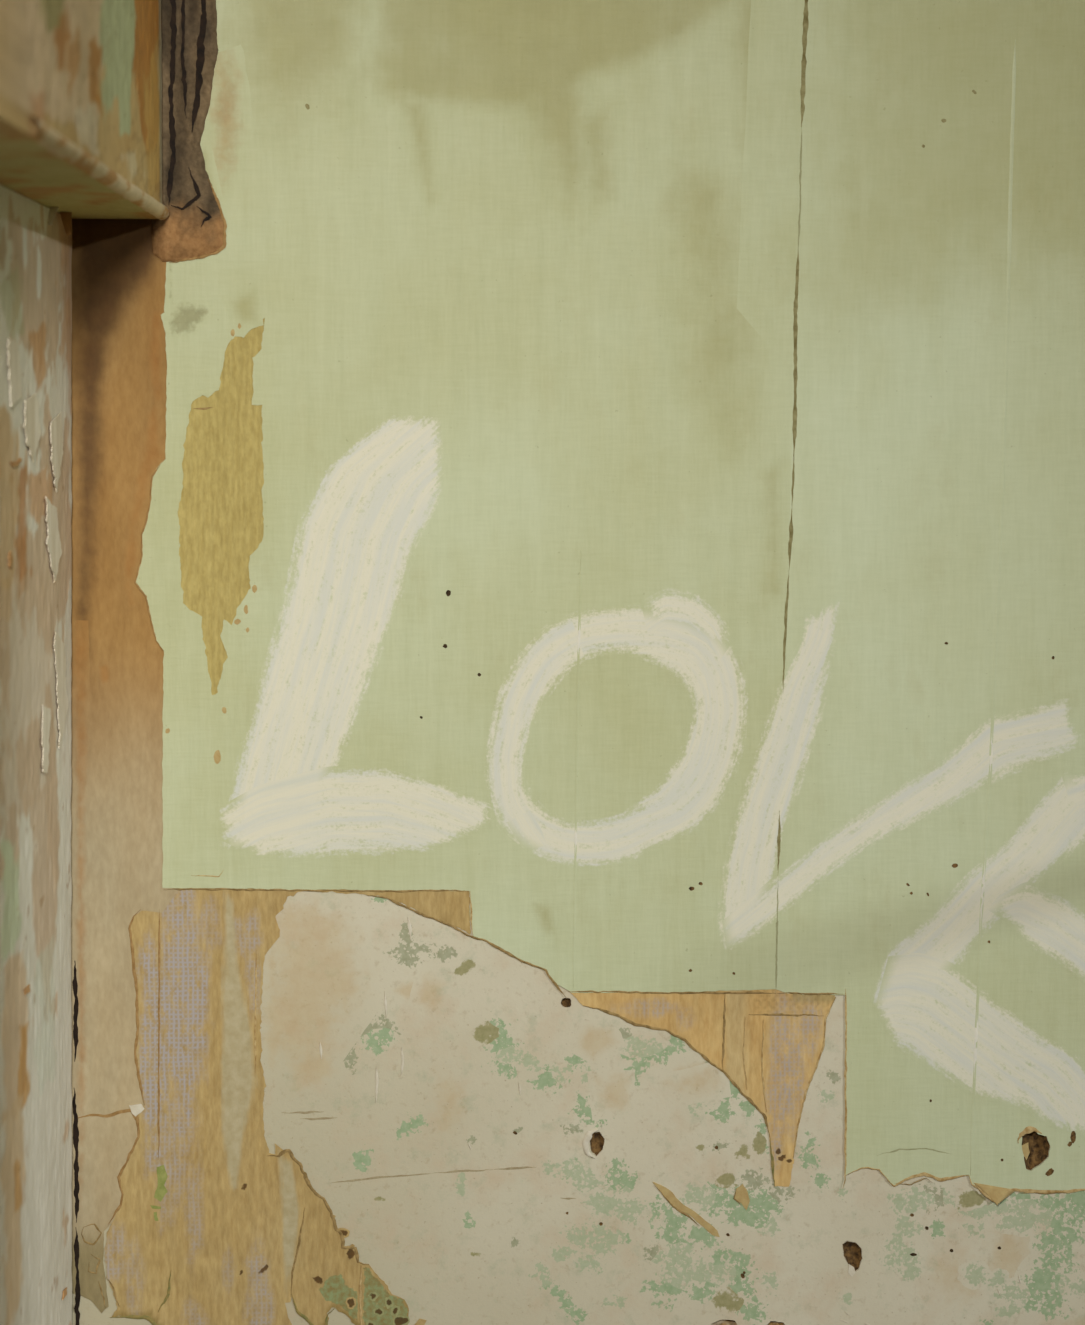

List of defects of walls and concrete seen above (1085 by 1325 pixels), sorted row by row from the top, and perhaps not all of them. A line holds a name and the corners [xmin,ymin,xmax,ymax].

peeling [7,338,63,583]
peeling [178,318,265,713]
peeling [41,631,69,773]
peeling [382,913,479,977]
peeling [468,1021,499,1047]
peeling [526,1049,587,1097]
peeling [536,1081,839,1325]
peeling [883,1179,1018,1244]
peeling [974,1197,1085,1325]